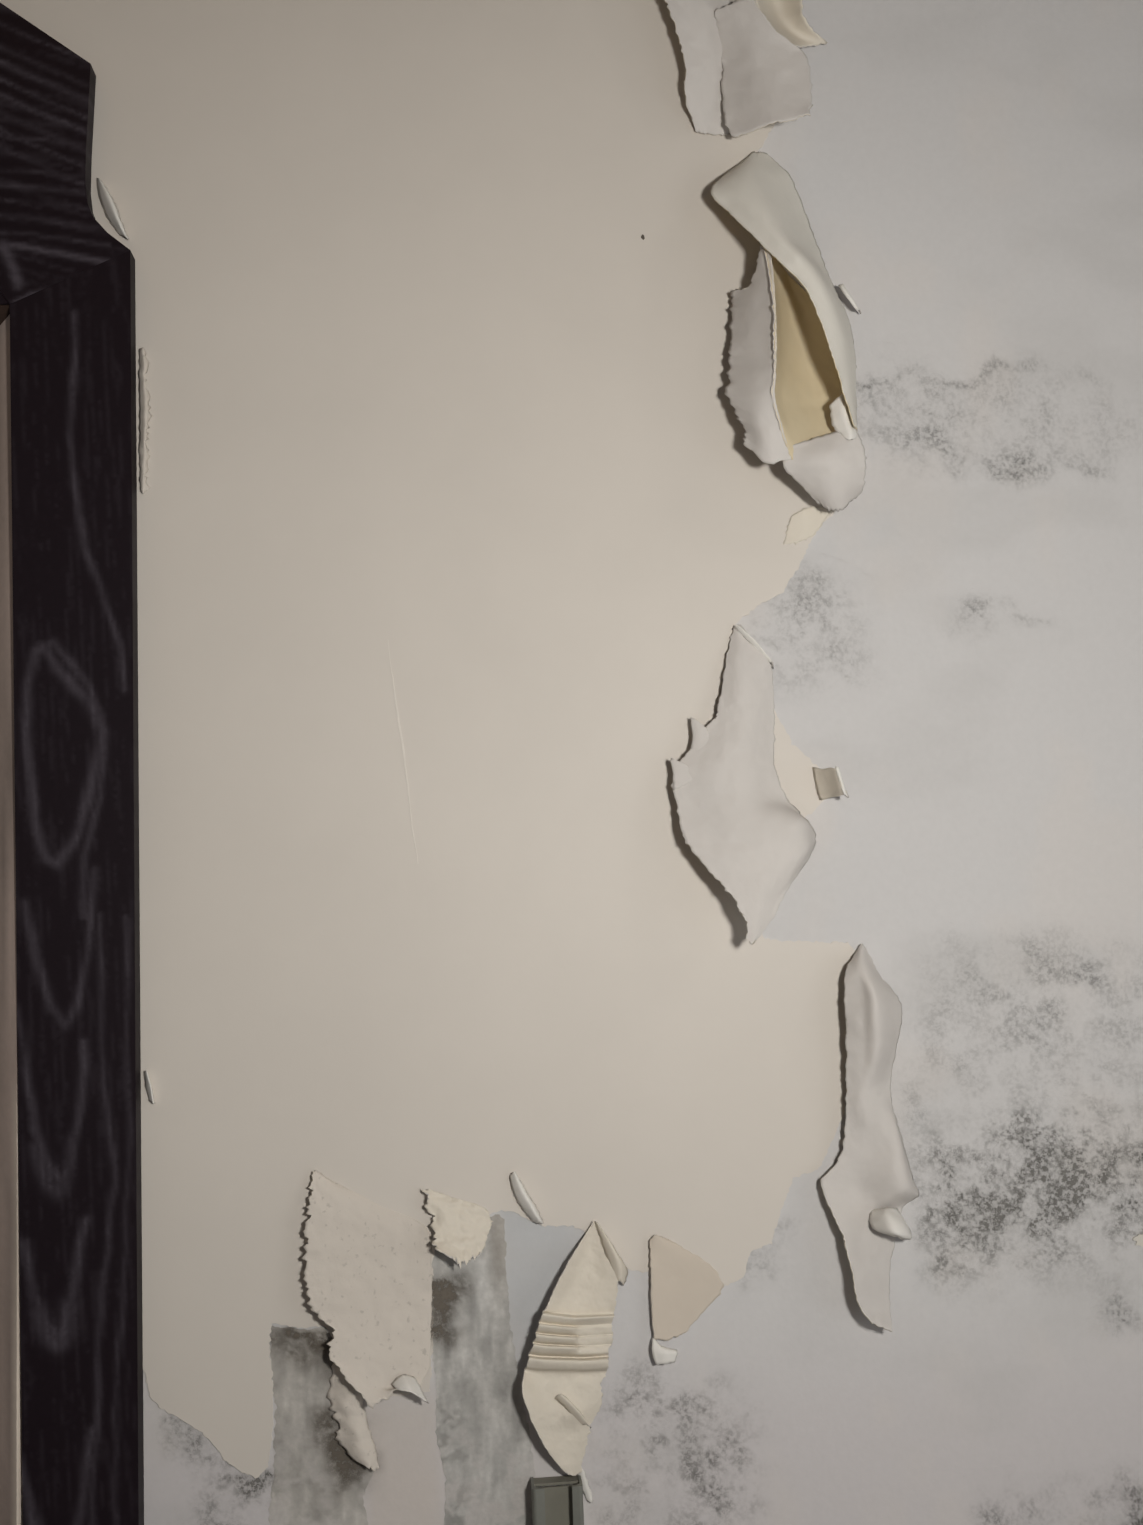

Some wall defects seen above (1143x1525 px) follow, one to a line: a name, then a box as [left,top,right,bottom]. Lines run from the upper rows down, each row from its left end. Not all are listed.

peeling [581,0,1143,1525]
mould [926,1115,1143,1248]
water stain [271,1328,333,1361]
peeling [143,1170,628,1525]
water stain [317,1411,368,1483]